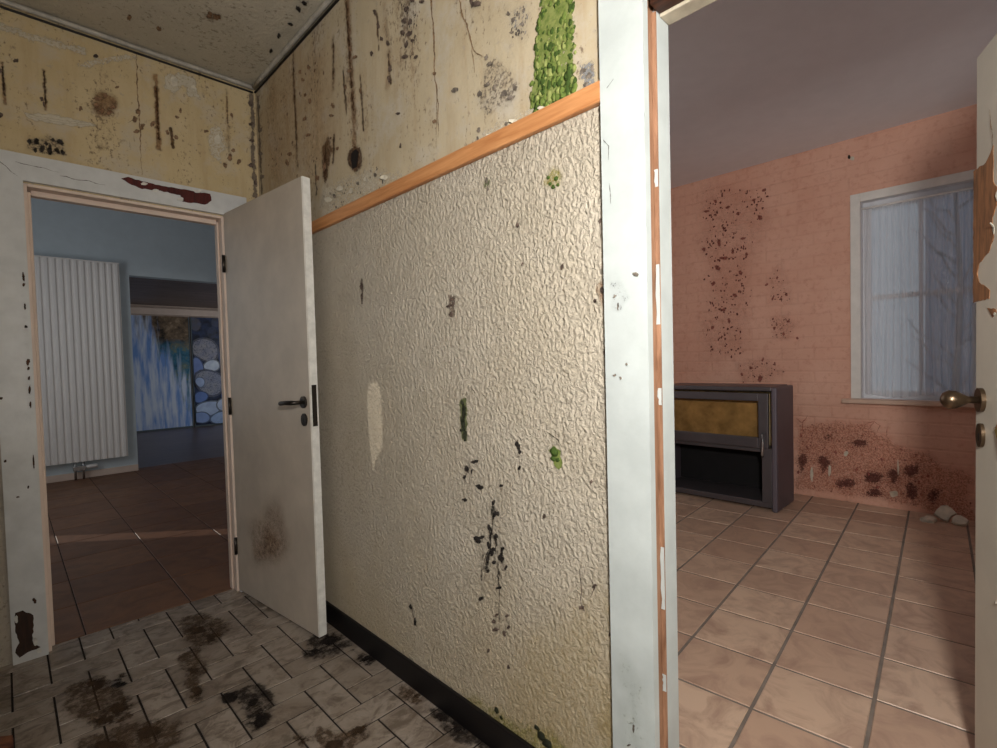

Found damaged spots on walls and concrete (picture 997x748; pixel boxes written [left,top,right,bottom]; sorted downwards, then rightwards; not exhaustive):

water stain [400,0,424,59]
water stain [506,6,528,40]
water stain [92,86,119,116]
water stain [477,54,518,115]
peeling [121,177,212,205]
water stain [313,134,339,194]
water stain [702,188,784,383]
water stain [473,500,508,601]
peeling [14,598,41,658]